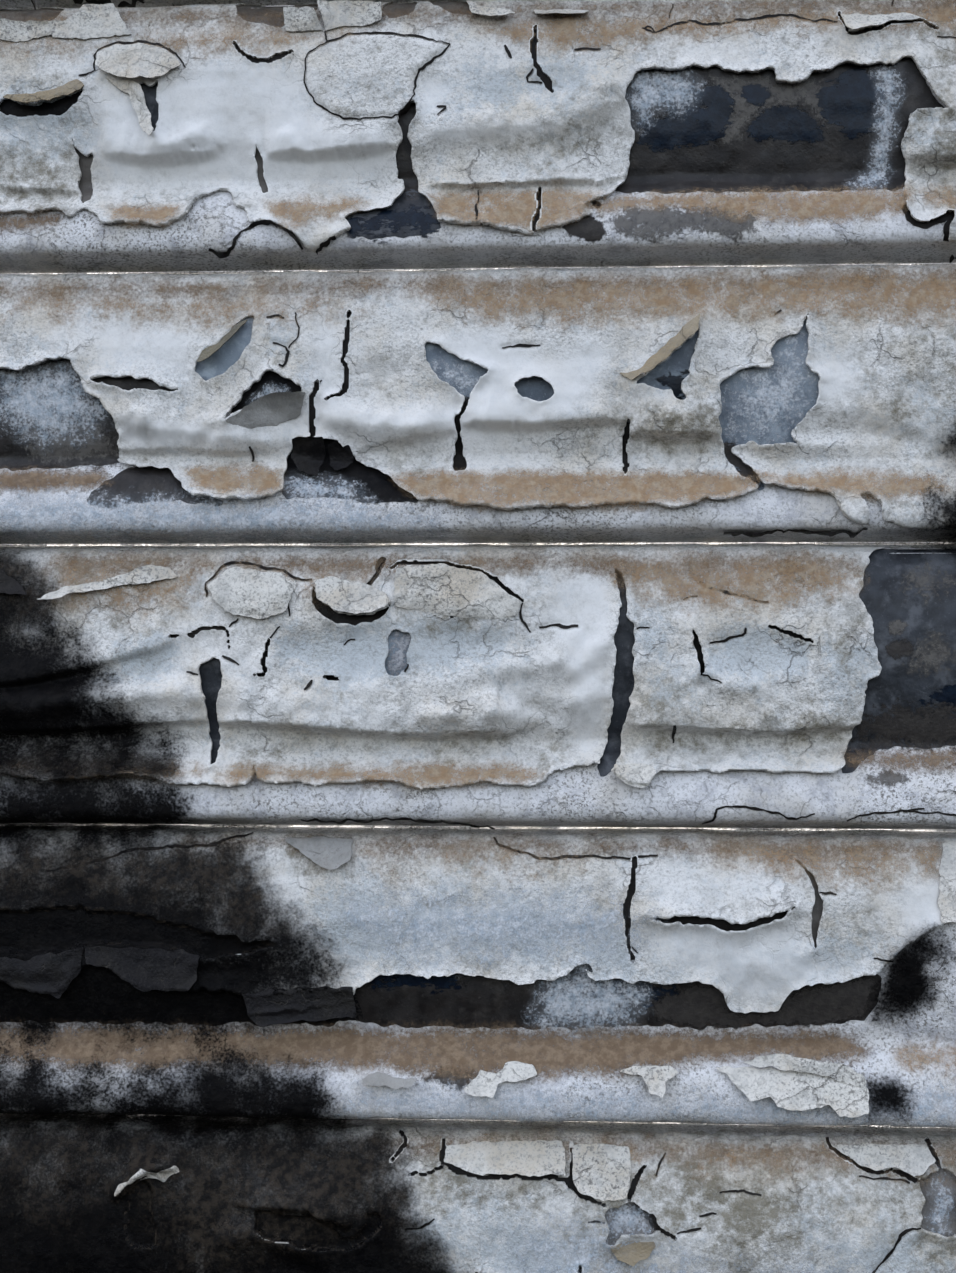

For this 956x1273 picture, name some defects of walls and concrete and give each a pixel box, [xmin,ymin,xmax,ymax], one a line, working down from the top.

peeling [0,3,181,135]
peeling [615,58,945,194]
peeling [0,359,223,508]
peeling [515,377,554,401]
peeling [718,317,820,491]
leakage [942,423,956,458]
peeling [842,549,956,773]
leakage [0,465,956,1273]
peeling [226,964,882,1035]
crack [391,1129,762,1240]
crack [826,1137,941,1184]
crack [872,1228,921,1273]